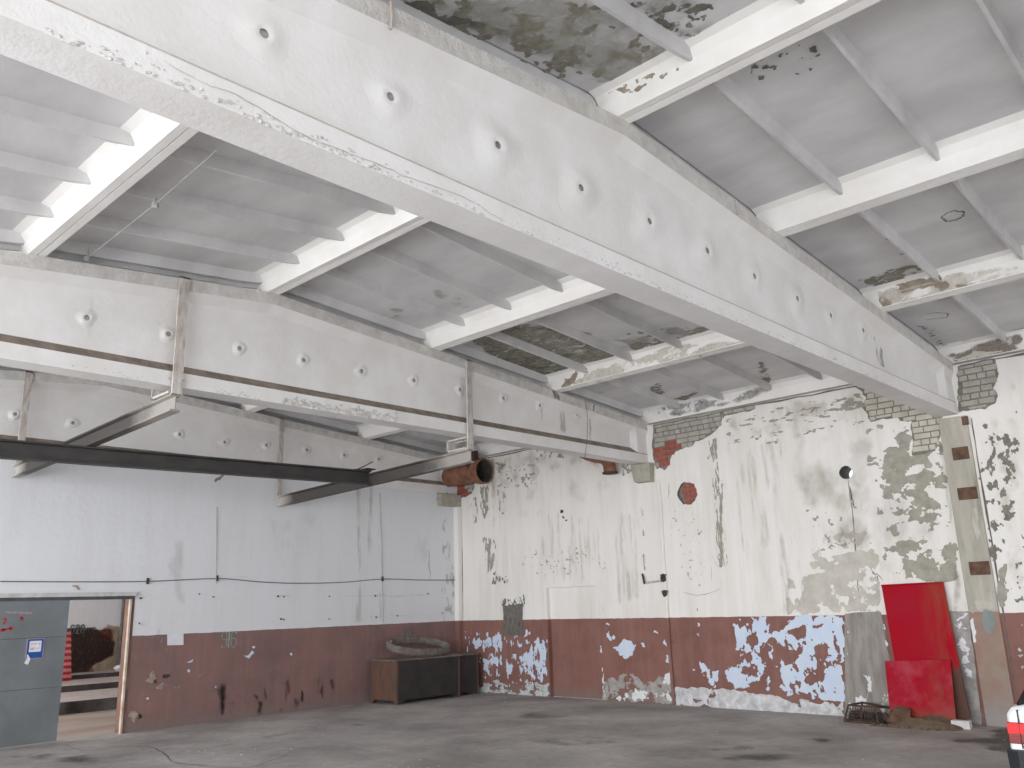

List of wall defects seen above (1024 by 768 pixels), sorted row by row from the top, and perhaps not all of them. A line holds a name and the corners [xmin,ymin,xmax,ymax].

spalling [44,27,442,196]
peeling [610,68,679,93]
peeling [879,275,968,307]
flaking render [952,349,1002,412]
peeling [600,387,959,717]
flaking render [949,423,1024,725]
peeling [465,629,550,696]